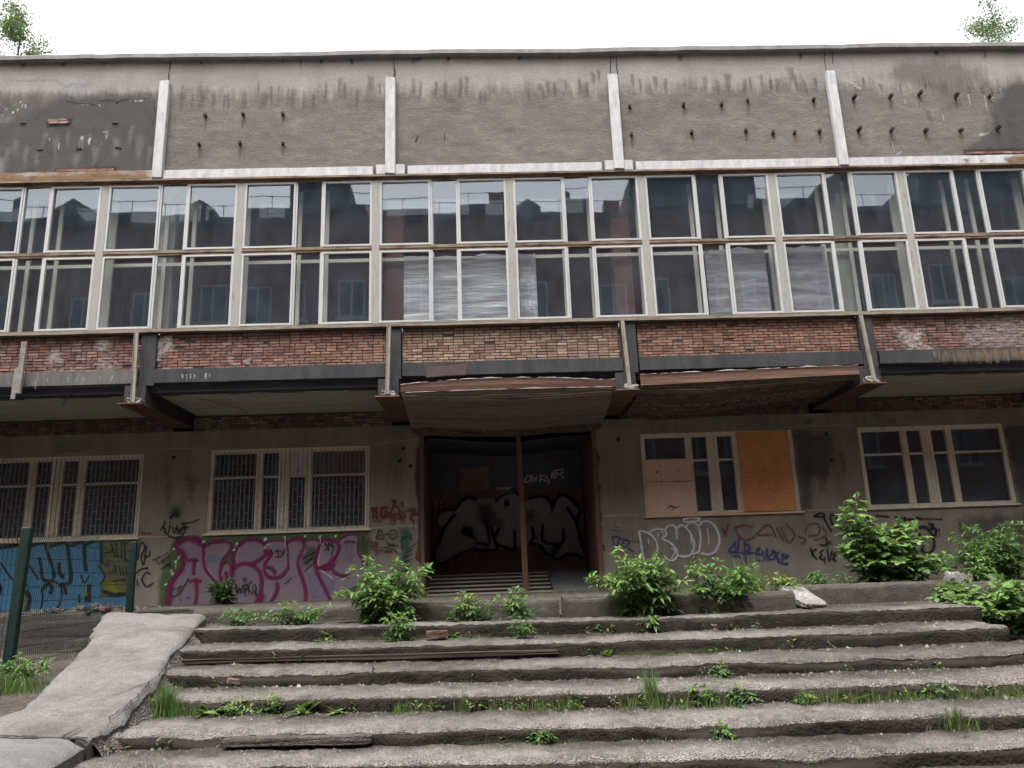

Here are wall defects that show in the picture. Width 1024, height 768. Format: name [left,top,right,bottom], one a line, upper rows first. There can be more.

damp [0,77,157,173]
damp [970,84,1024,150]
damp [894,326,1024,363]